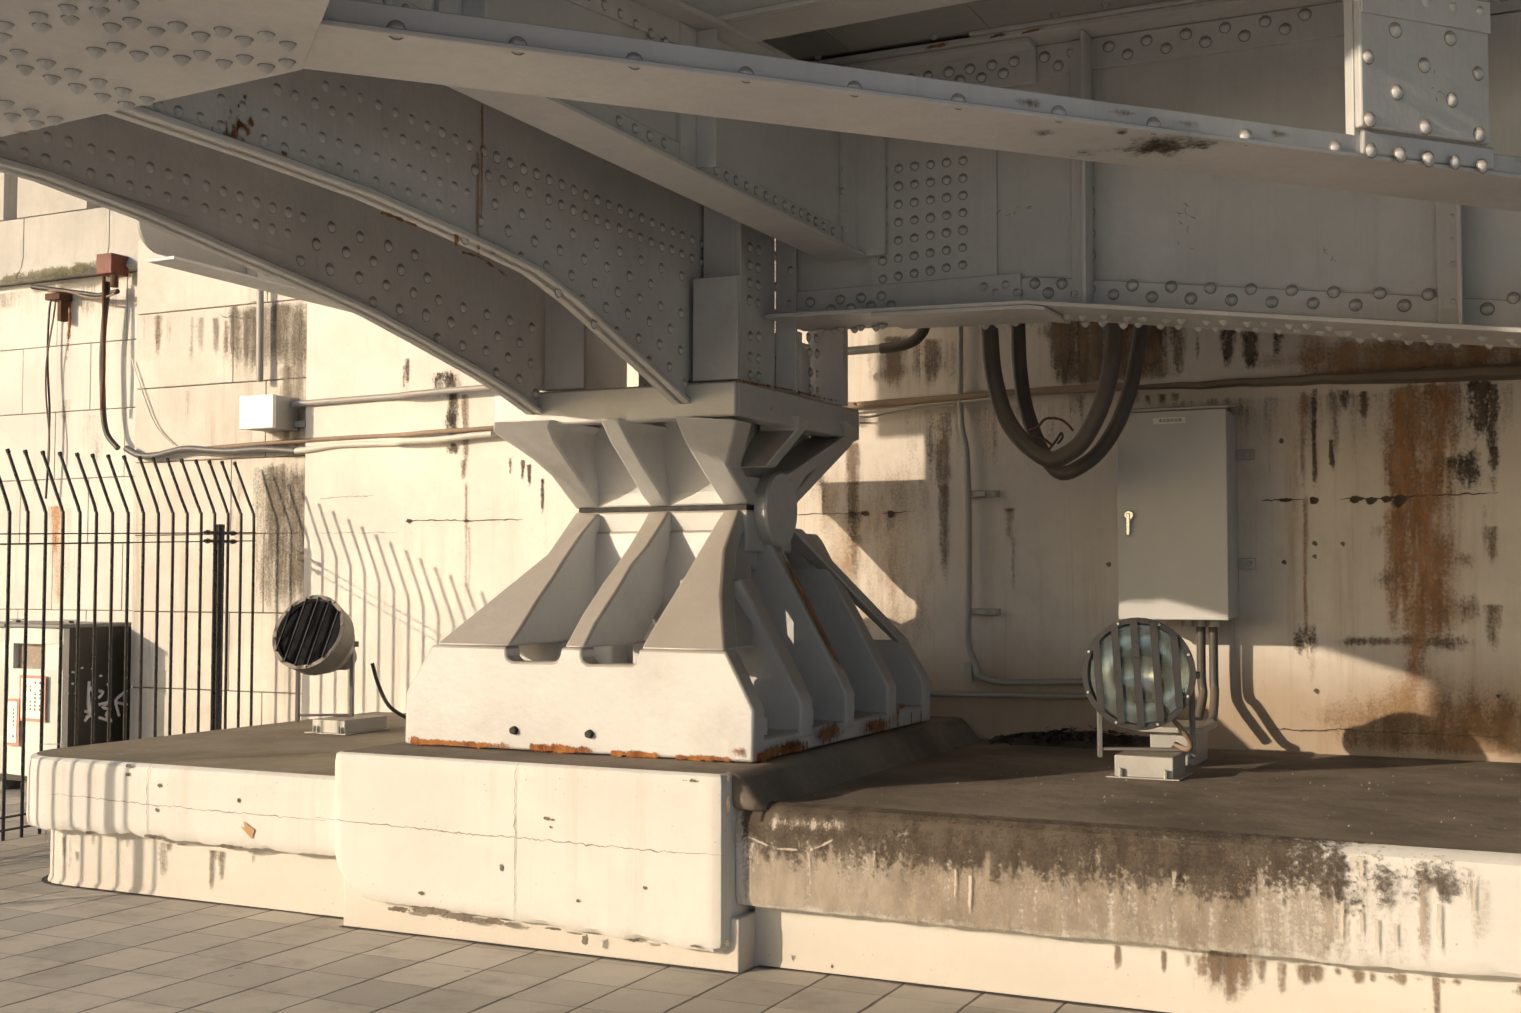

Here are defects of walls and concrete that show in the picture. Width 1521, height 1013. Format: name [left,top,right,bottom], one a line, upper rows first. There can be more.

corrosion [212,95,254,141]
corrosion [454,105,505,275]
damp [213,304,307,436]
damp [1045,321,1199,410]
damp [1220,330,1283,368]
corrosion [1310,341,1521,752]
corrosion [410,736,509,749]
corrosion [529,743,590,754]
corrosion [610,750,657,758]
corrosion [675,723,843,763]
damp [734,801,1475,997]
damp [1433,978,1460,1013]